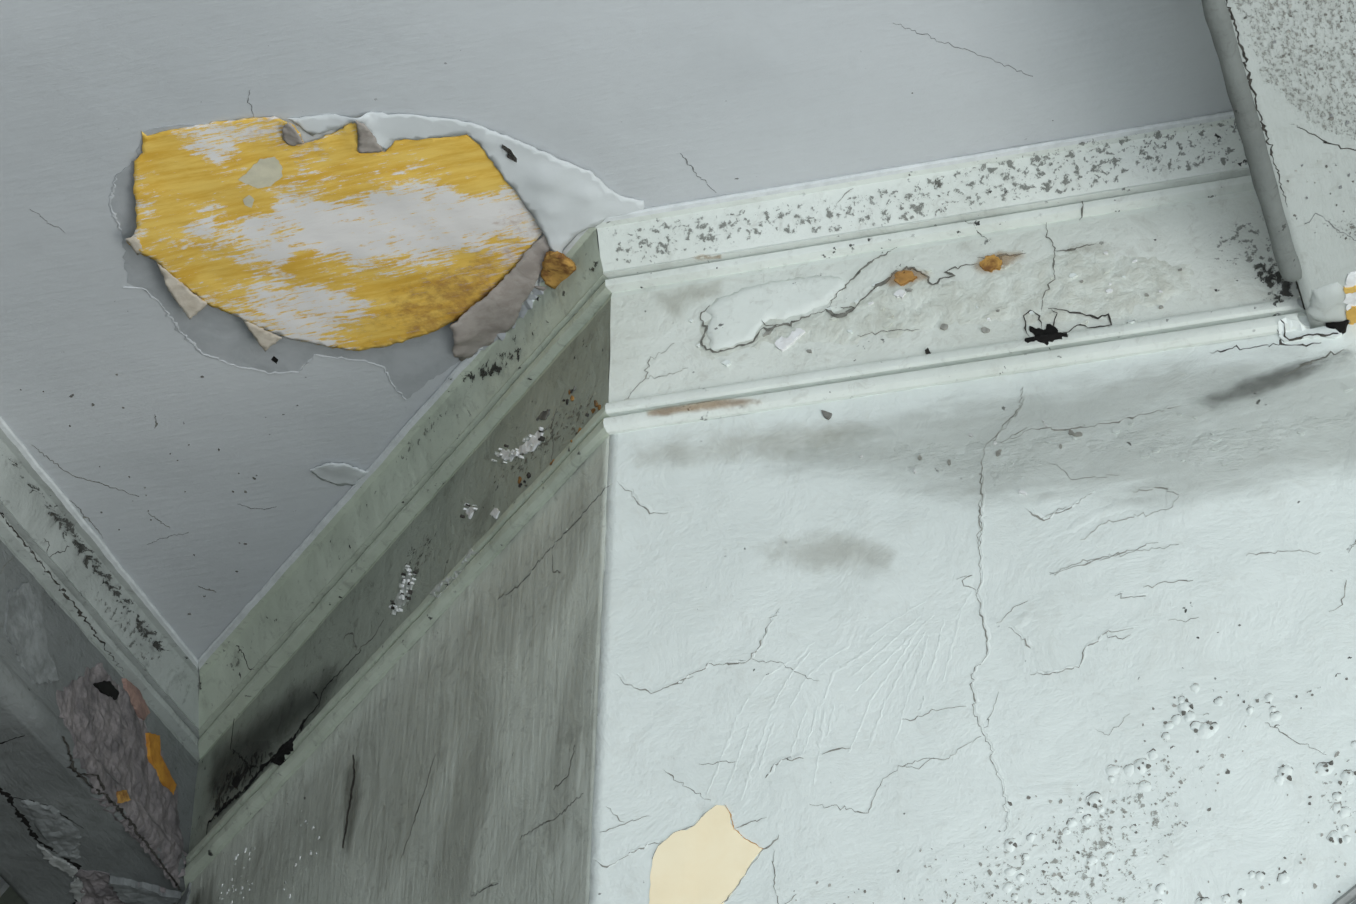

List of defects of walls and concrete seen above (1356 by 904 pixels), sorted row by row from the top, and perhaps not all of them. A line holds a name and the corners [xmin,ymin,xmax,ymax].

peeling [108,111,644,399]
crack [624,201,1094,400]
rust [894,270,917,286]
rust [979,254,1003,273]
spalling [491,386,576,487]
crack [810,386,1193,832]
crack [1246,543,1356,612]
crack [0,787,85,904]
spalling [4,582,188,904]
damp [212,684,326,819]
crack [520,745,666,868]
peeling [649,805,764,904]